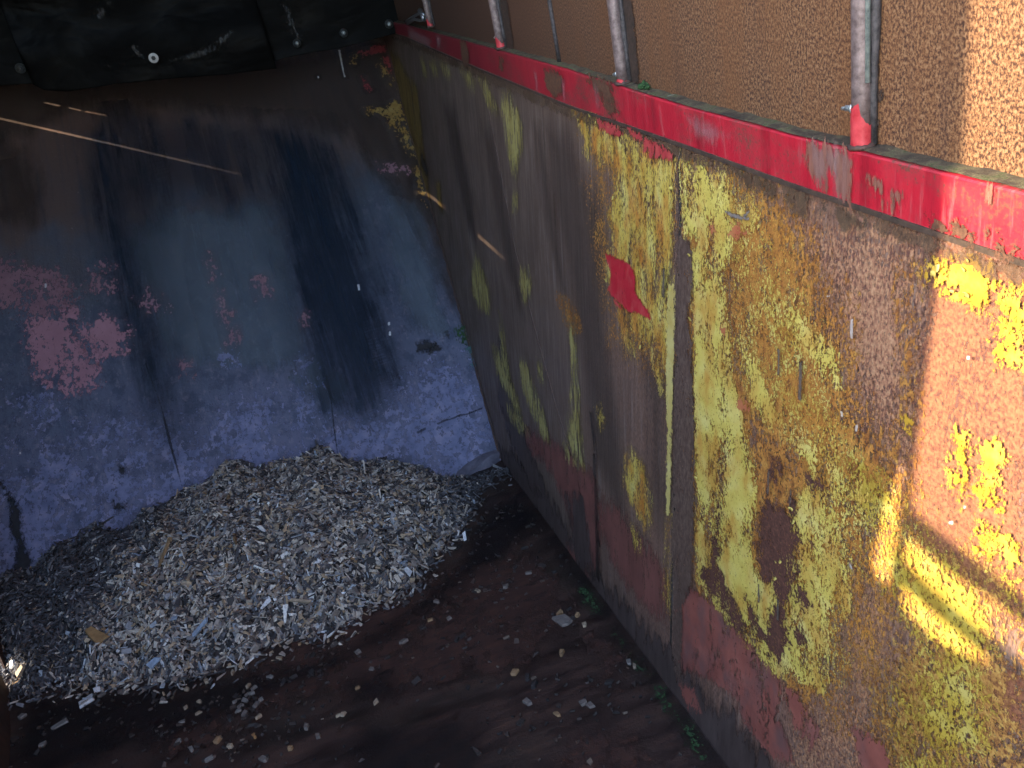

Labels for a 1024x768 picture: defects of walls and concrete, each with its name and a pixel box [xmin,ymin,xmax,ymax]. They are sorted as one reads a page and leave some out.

rust [499,0,513,72]
rust [543,68,562,99]
rust [585,71,620,117]
rust [623,0,639,83]
peeling [366,99,428,208]
water stain [96,132,383,410]
rust [416,331,449,353]
peeling [0,250,496,576]
peeling [572,108,1024,768]
rust [579,128,1024,768]
rust [238,537,581,712]
rust [558,728,664,768]